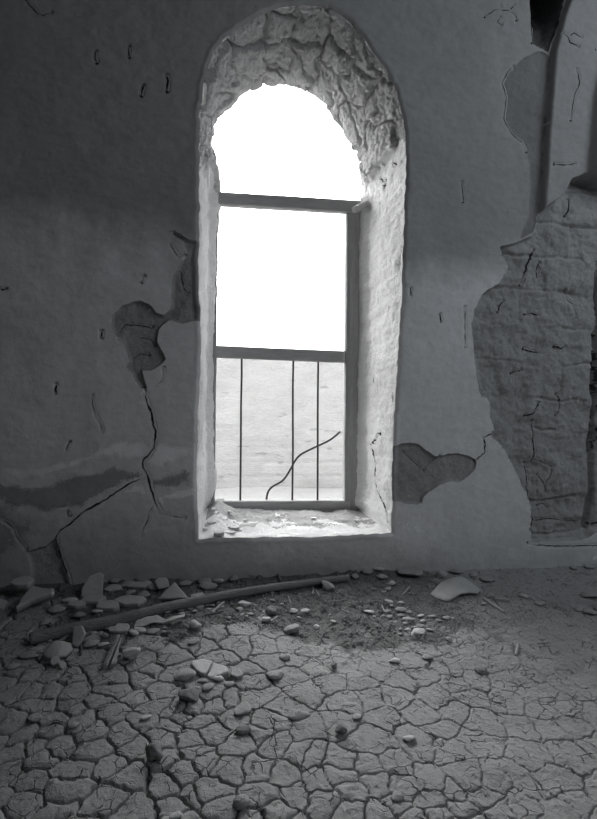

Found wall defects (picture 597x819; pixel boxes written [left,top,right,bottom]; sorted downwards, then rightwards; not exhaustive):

spalling [99,230,200,390]
spalling [471,0,597,542]
crack [47,388,185,585]
crack [370,430,388,521]
spalling [392,443,476,505]